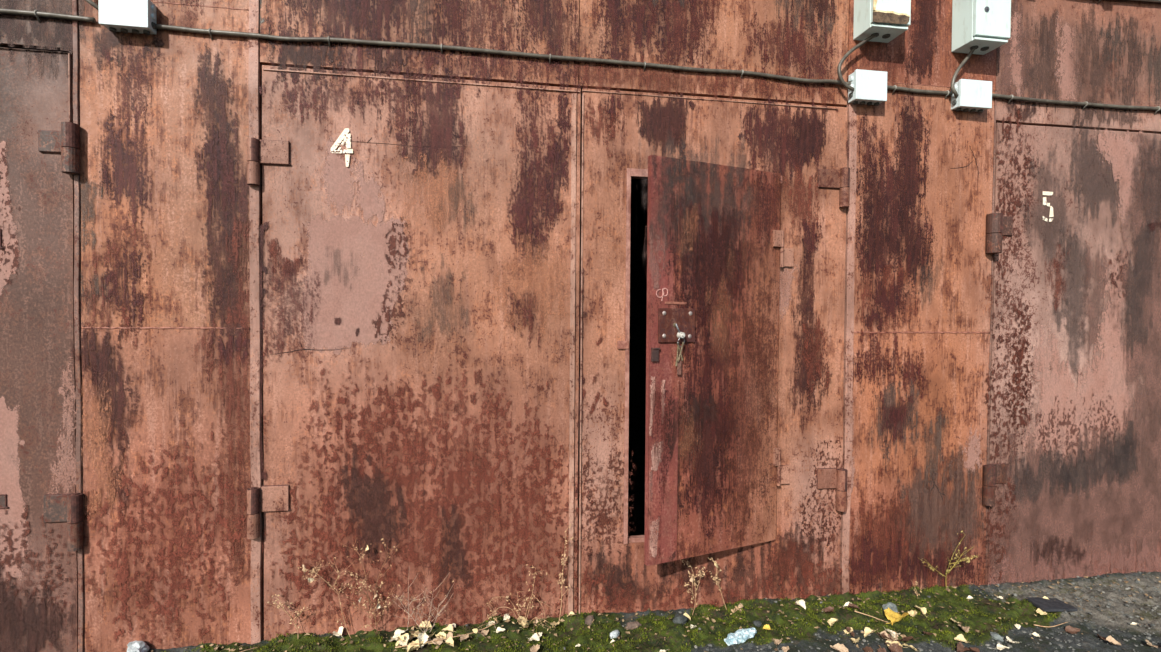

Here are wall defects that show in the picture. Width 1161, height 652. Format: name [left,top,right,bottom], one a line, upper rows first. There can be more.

peeling [0,141,21,296]
corrosion [71,28,269,648]
corrosion [259,0,988,636]
corrosion [1045,244,1065,310]
peeling [0,396,85,610]